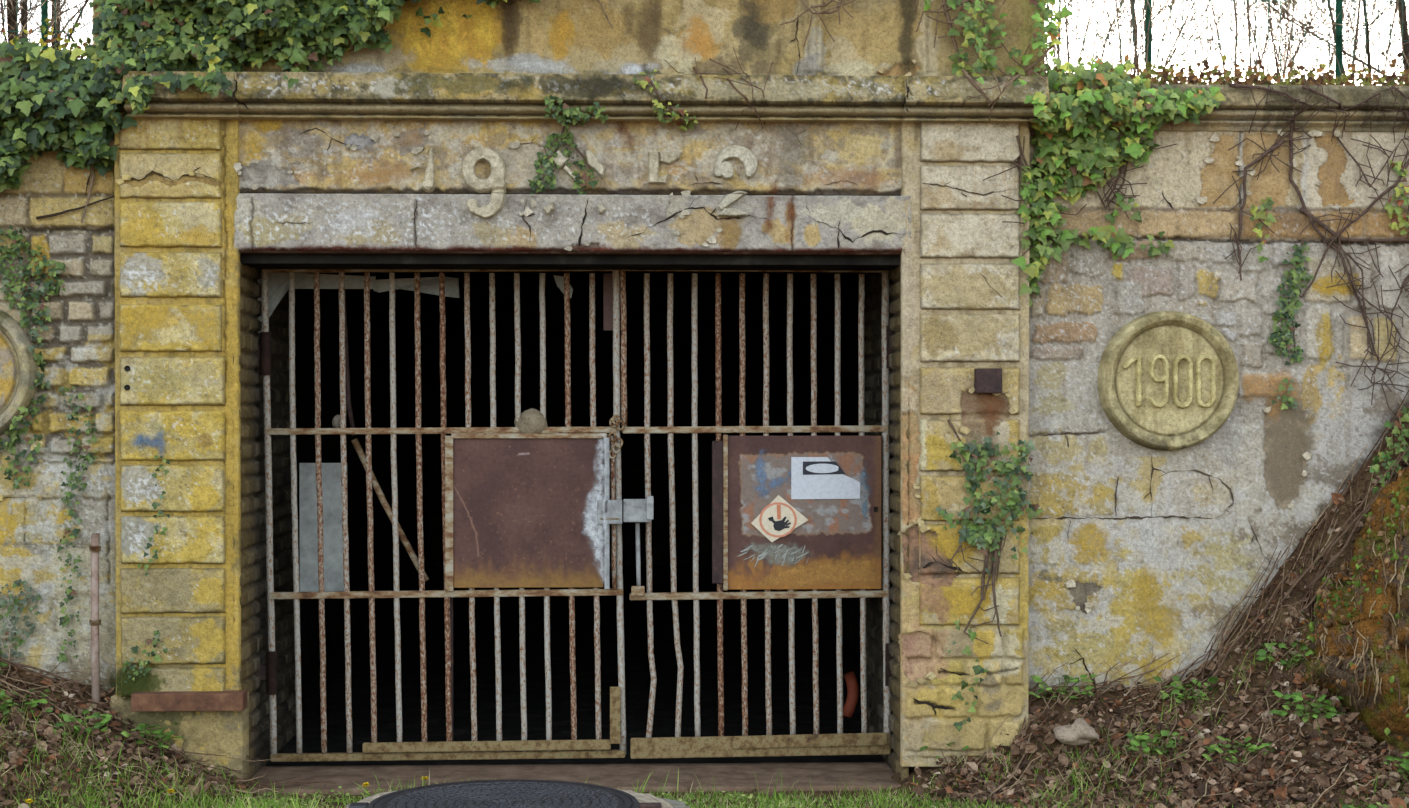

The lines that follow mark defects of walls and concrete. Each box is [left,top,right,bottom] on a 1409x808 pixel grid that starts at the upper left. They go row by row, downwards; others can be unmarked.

damp [469,0,658,98]
damp [901,0,913,72]
crack [121,166,220,181]
spalling [342,124,430,156]
peeling [1196,129,1297,211]
peeling [1307,129,1355,207]
crack [578,199,588,247]